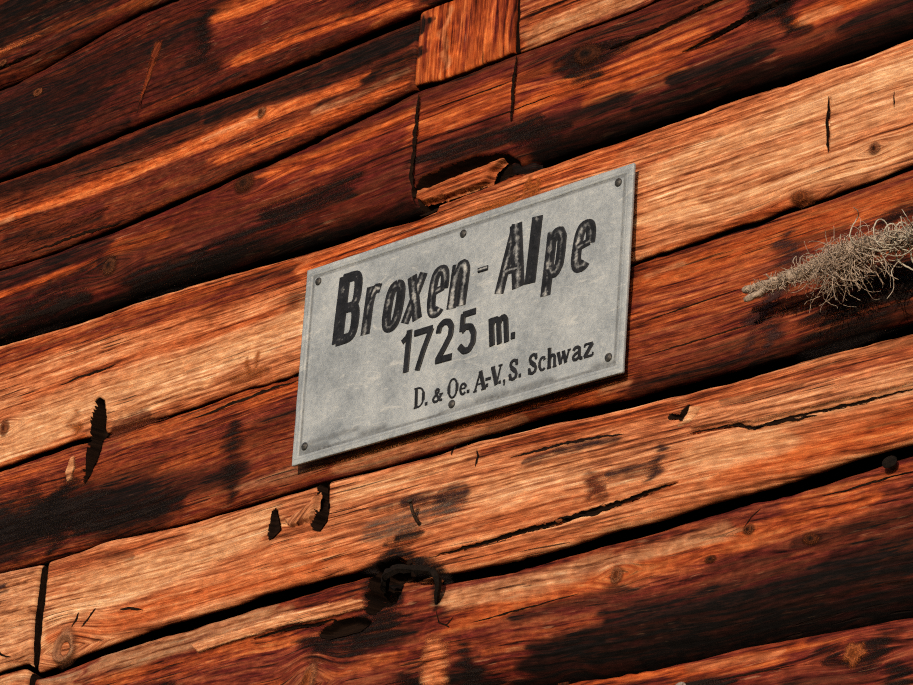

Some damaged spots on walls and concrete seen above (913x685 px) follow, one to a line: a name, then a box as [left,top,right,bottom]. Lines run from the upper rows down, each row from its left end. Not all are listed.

crack [823,96,831,153]
crack [688,389,913,435]
crack [435,482,677,557]